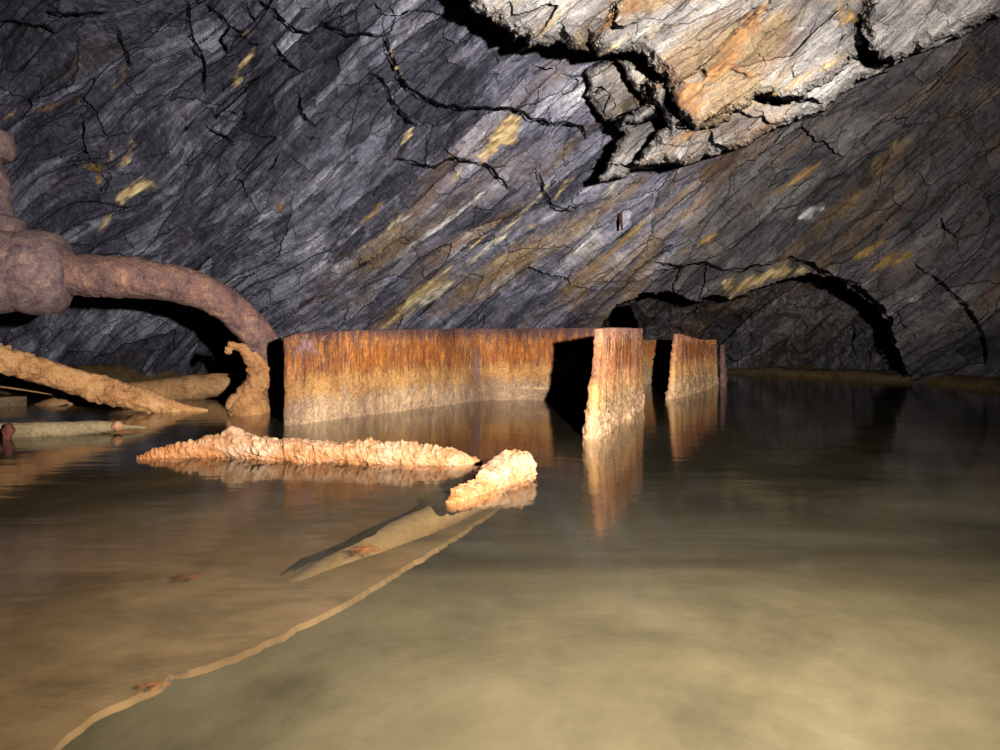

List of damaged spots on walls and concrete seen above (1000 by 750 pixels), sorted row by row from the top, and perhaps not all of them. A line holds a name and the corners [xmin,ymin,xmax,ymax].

crack [188,0,738,149]
crack [394,158,509,189]
crack [656,256,917,377]
corrosion [326,338,480,390]
corrosion [495,340,558,370]
corrosion [607,334,640,373]